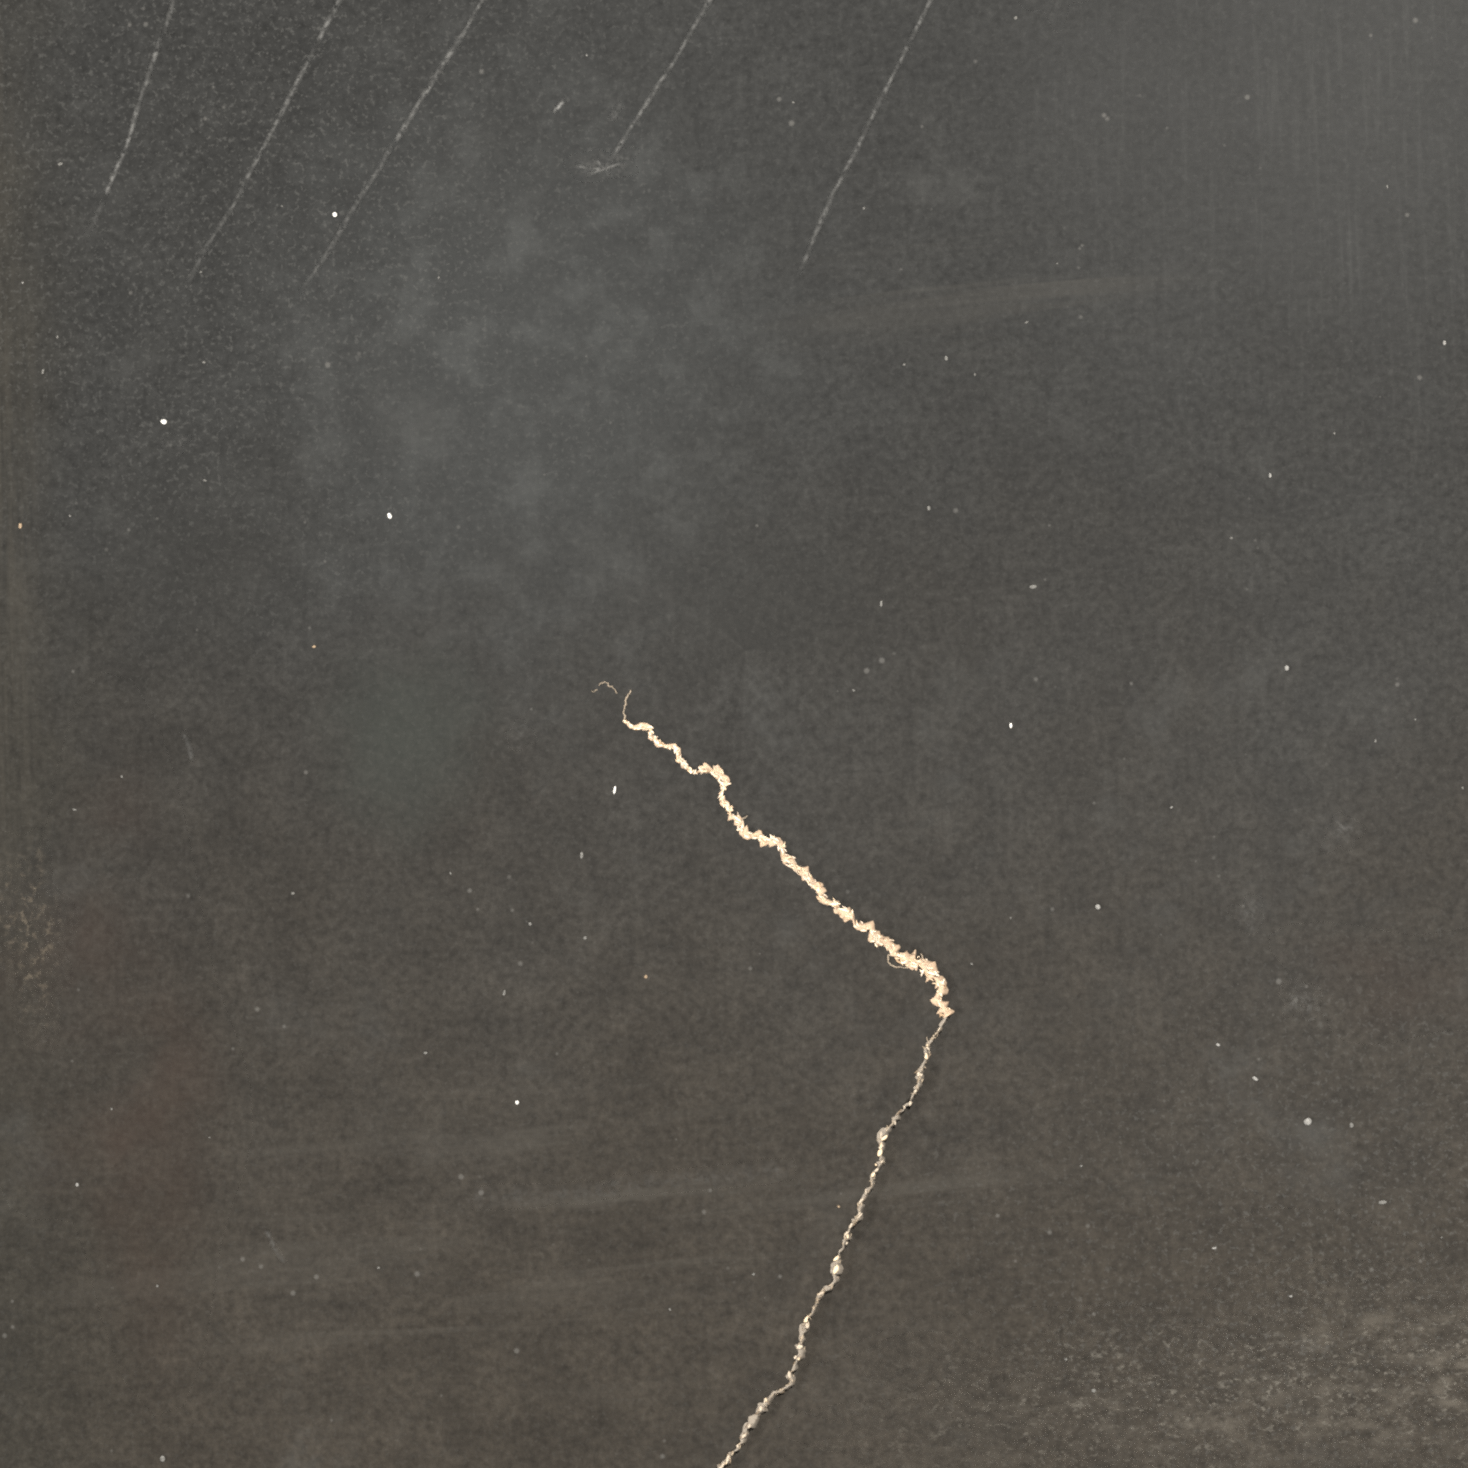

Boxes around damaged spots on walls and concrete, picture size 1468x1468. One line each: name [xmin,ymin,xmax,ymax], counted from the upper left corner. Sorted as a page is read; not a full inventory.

crack [591,681,955,1468]